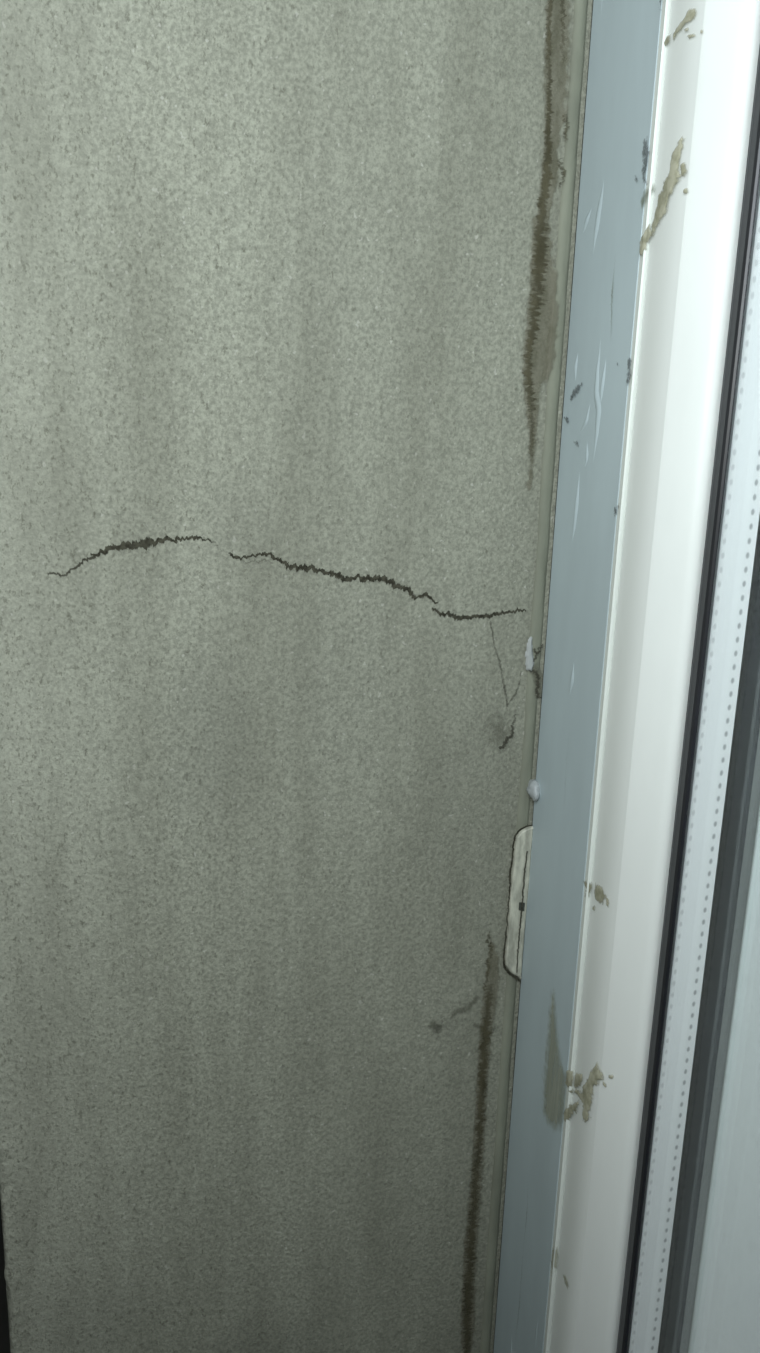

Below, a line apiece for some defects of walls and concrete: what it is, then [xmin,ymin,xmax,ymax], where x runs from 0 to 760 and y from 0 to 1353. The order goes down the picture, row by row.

damp [522,0,570,489]
peeling [635,139,653,205]
crack [48,535,526,634]
damp [454,935,499,1353]